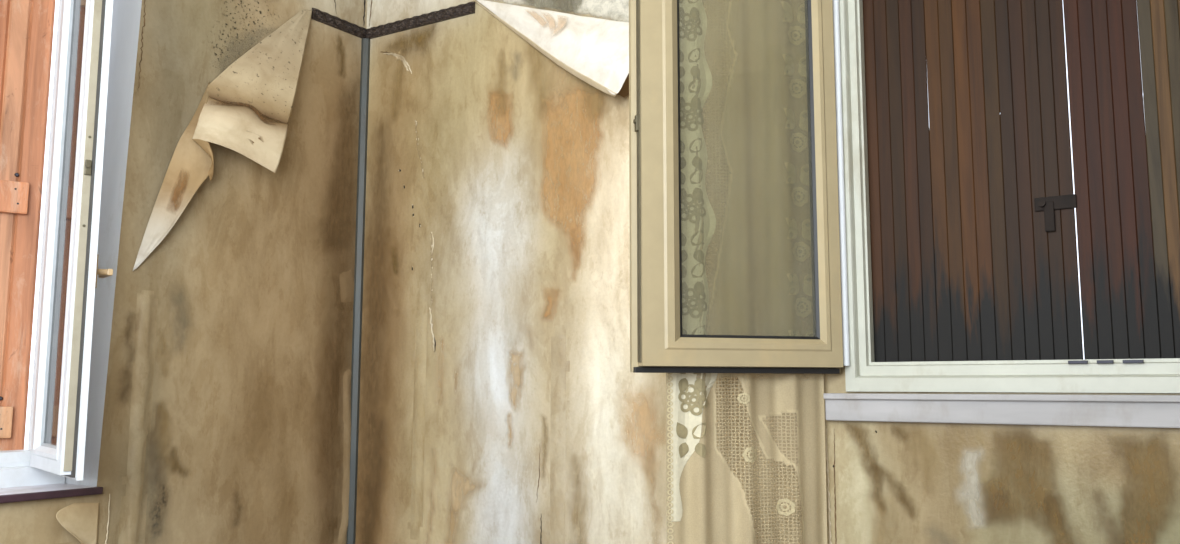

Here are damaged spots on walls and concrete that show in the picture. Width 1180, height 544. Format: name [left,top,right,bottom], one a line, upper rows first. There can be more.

flaking render [503,0,629,22]
water stain [543,62,600,257]
water stain [850,426,883,508]
water stain [985,434,1073,544]
water stain [1121,438,1173,544]